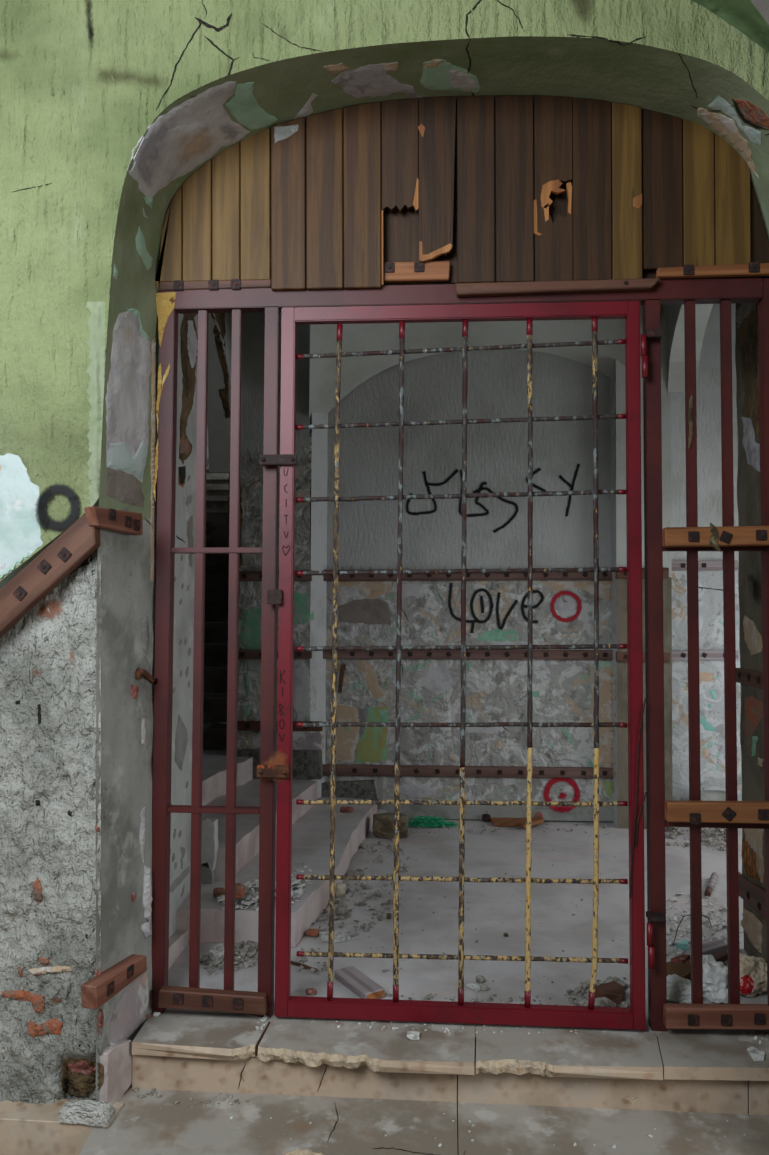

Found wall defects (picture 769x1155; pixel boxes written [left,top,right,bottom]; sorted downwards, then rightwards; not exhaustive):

crack [156,0,321,110]
peeling [324,59,481,99]
crack [465,0,525,96]
peeling [127,81,318,270]
peeling [697,95,769,178]
spalling [735,303,760,472]
peeling [106,292,230,581]
peeling [0,453,43,578]
flaking render [33,878,43,905]
flaking render [2,957,72,1038]
crack [318,1066,339,1143]
crack [373,1147,434,1155]